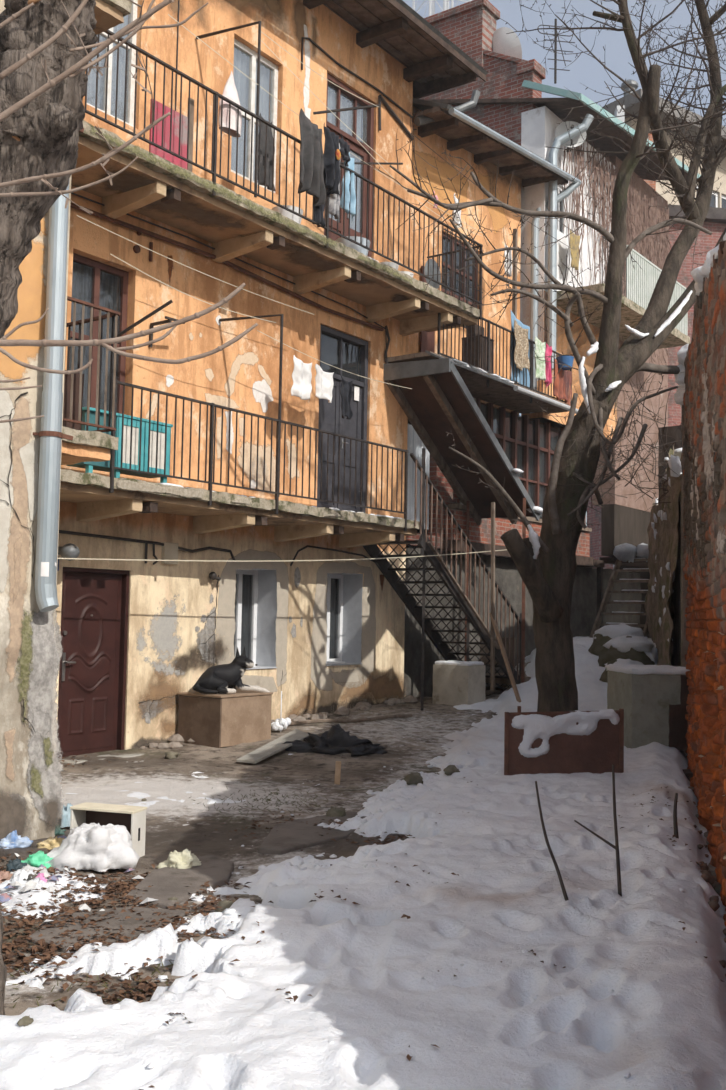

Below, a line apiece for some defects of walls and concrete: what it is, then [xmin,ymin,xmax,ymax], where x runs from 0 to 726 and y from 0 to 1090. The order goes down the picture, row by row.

peeling [205,352,300,504]
crack [0,392,35,591]
spalling [117,480,204,499]
peeling [137,595,185,676]
peeling [195,593,216,664]